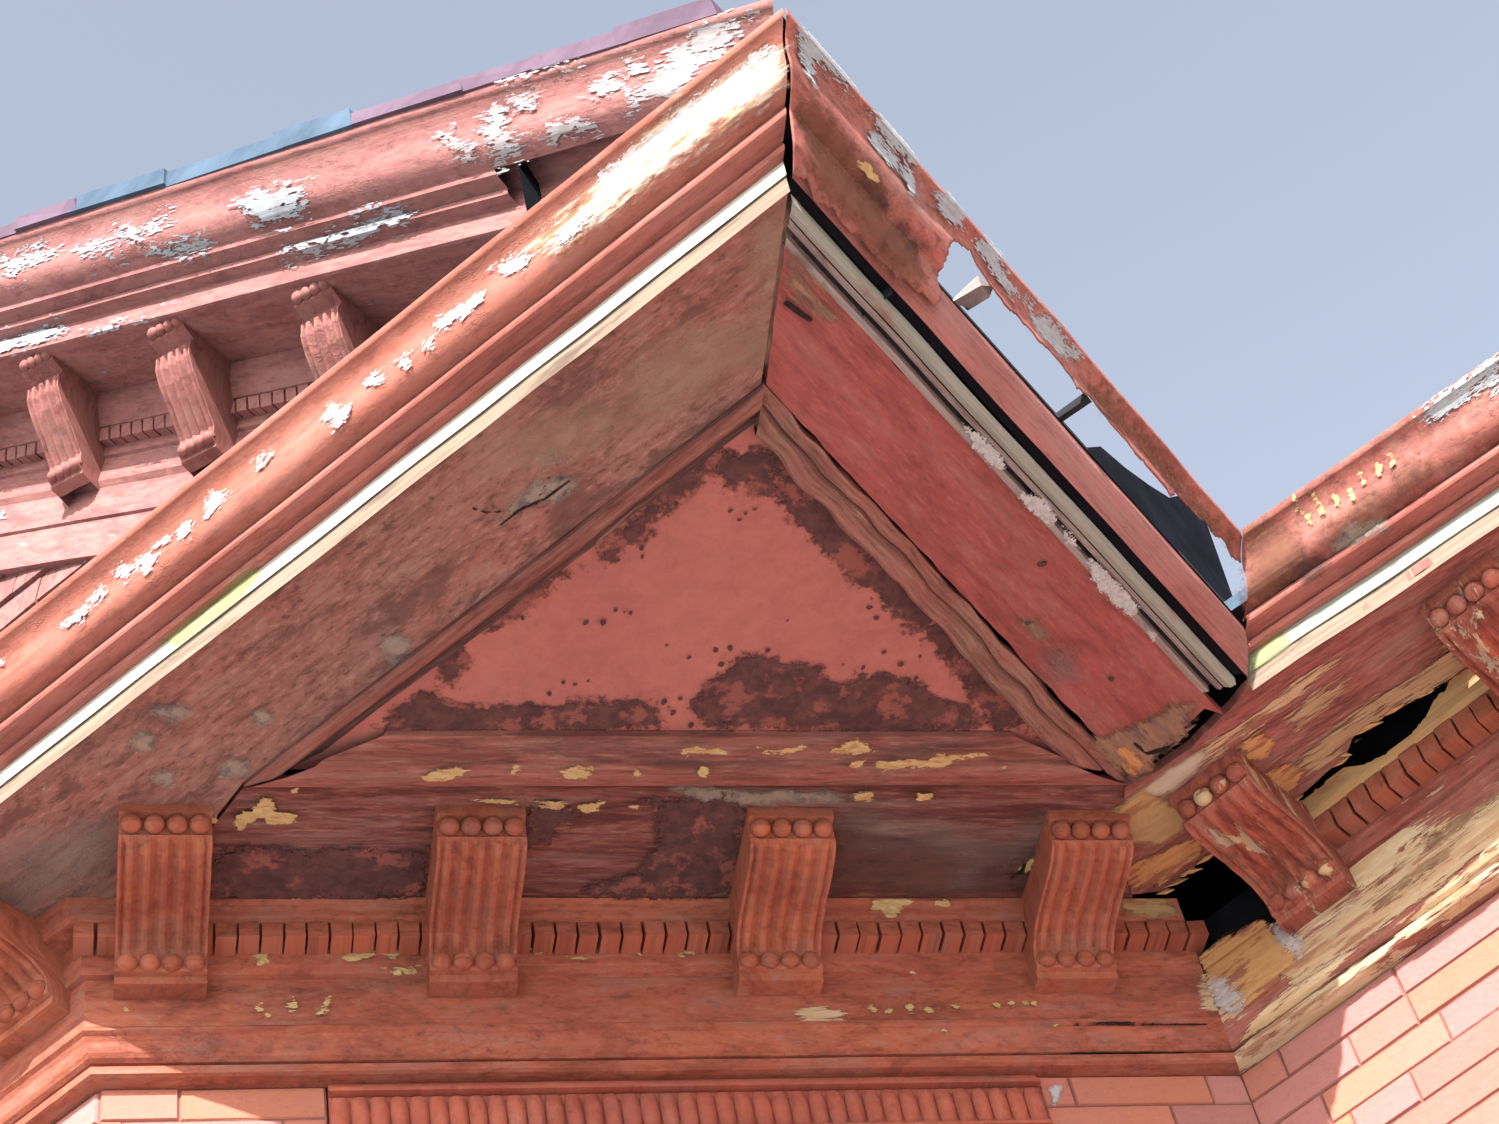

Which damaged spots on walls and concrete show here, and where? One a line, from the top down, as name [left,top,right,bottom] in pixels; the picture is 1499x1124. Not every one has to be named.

peeling [0,203,218,288]
peeling [227,175,420,268]
peeling [427,8,1085,364]
peeling [0,312,158,358]
peeling [361,289,486,387]
peeling [1413,353,1499,424]
peeling [60,488,233,631]
peeling [1143,645,1467,796]
leakage [525,800,580,850]
leakage [580,792,747,901]
leakage [830,820,1036,898]
peeling [1235,790,1499,1058]